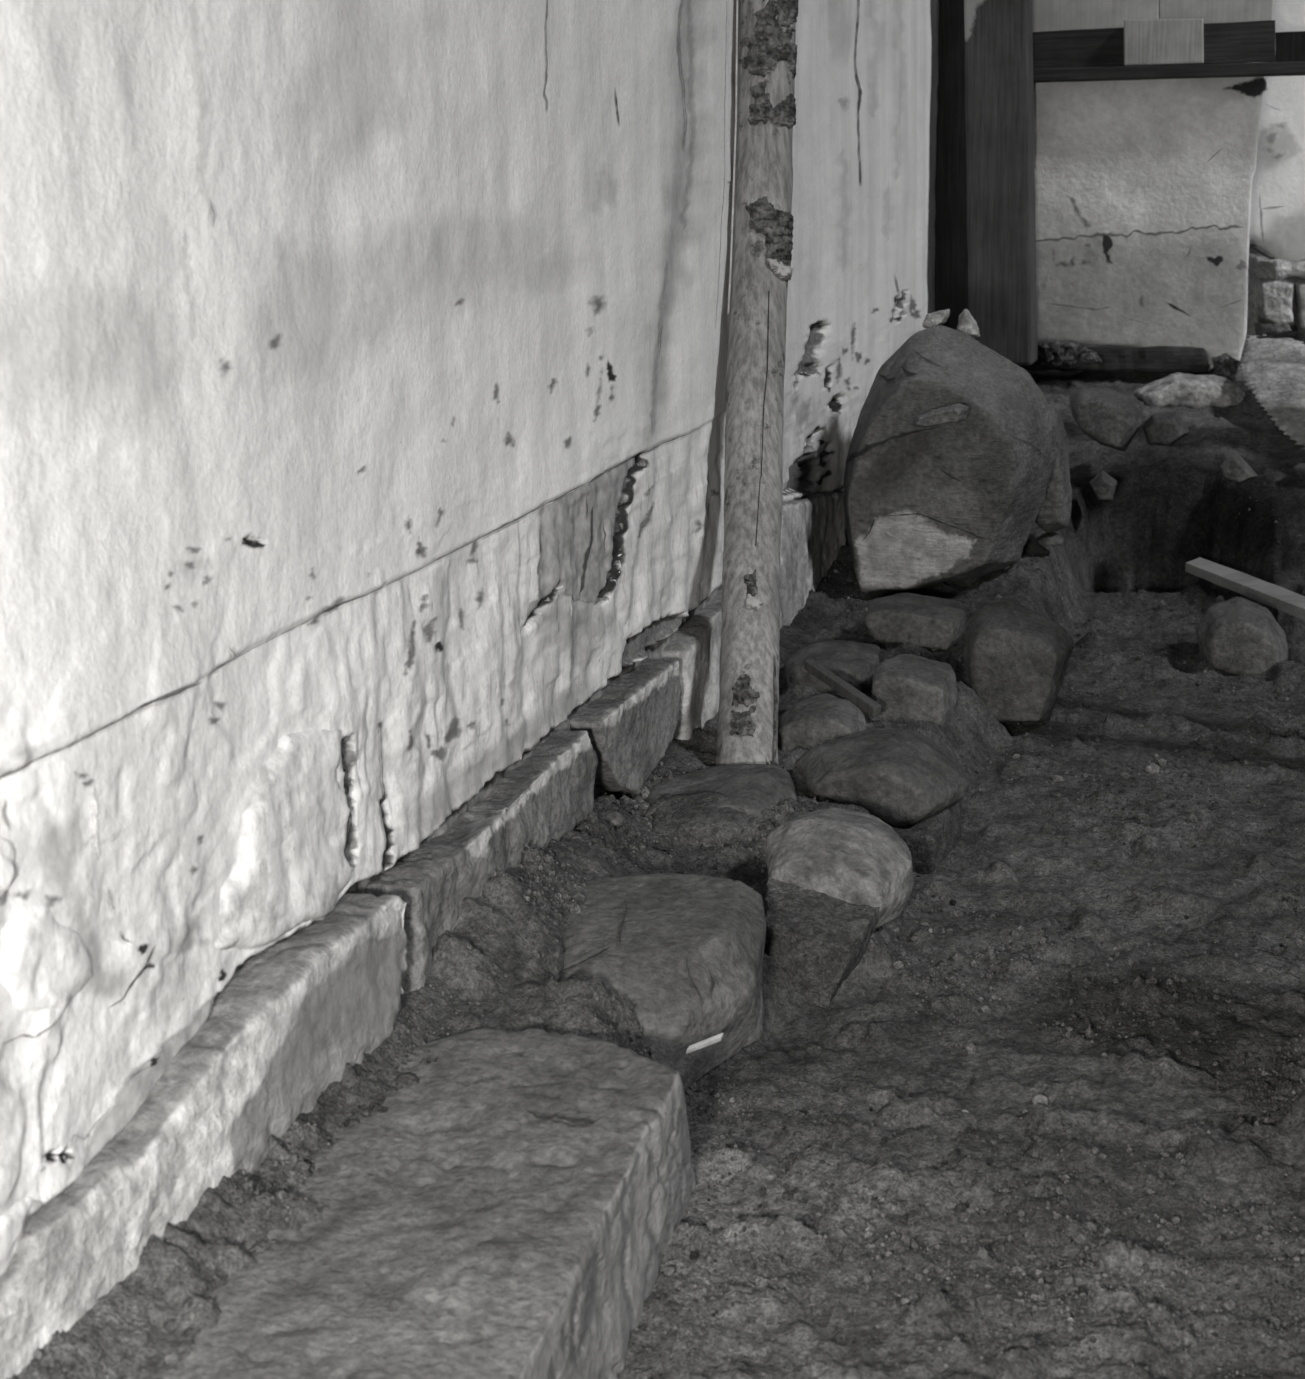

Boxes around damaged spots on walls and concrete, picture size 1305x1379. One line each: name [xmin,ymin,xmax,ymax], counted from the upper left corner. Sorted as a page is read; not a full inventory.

crack [1036,197,1282,259]
crack [0,433,690,778]
flaking render [524,453,653,625]
spalling [408,718,475,759]